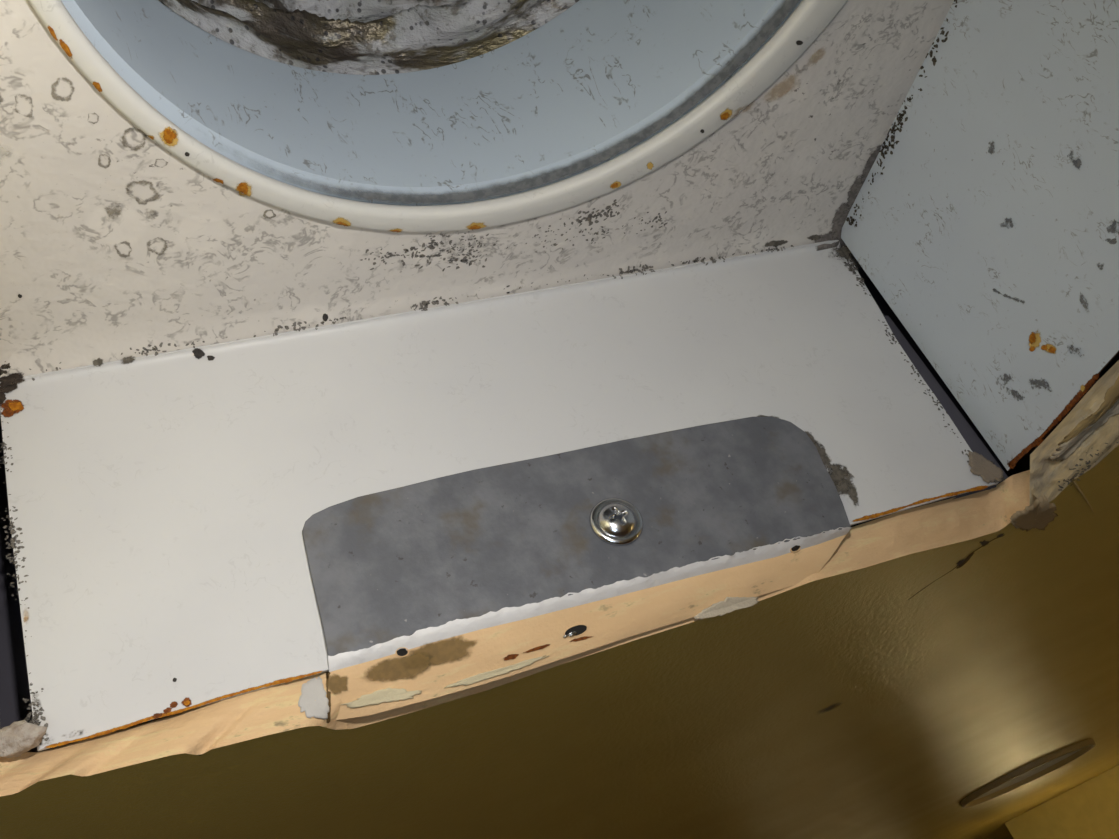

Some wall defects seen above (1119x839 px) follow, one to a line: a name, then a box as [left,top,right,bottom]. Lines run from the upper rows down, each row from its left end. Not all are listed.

corrosion [48,26,72,59]
corrosion [149,127,178,146]
corrosion [236,182,251,197]
damp [361,233,508,271]
damp [521,199,667,254]
corrosion [1029,332,1056,354]
peeling [1007,378,1051,400]
peeling [1048,376,1119,462]
damp [0,361,29,609]
crack [908,537,999,600]
damp [23,673,49,745]
corrosion [44,671,322,748]